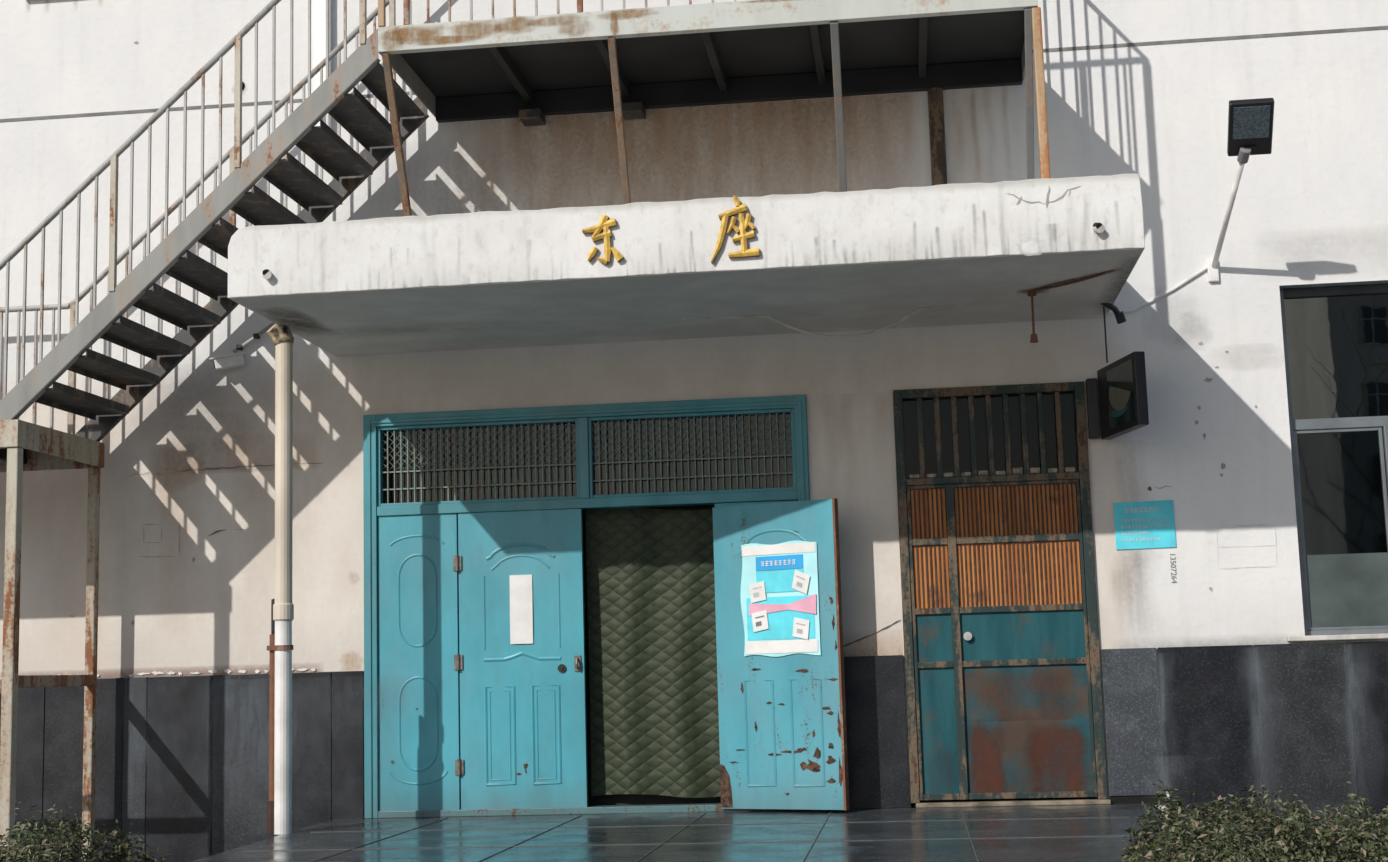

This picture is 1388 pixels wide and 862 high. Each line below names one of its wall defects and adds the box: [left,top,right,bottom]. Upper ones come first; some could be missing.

corrosion [386,18,570,45]
corrosion [611,11,642,35]
crack [1007,186,1080,208]
peeling [720,749,744,808]
peeling [768,707,843,786]
corrosion [971,726,1004,793]